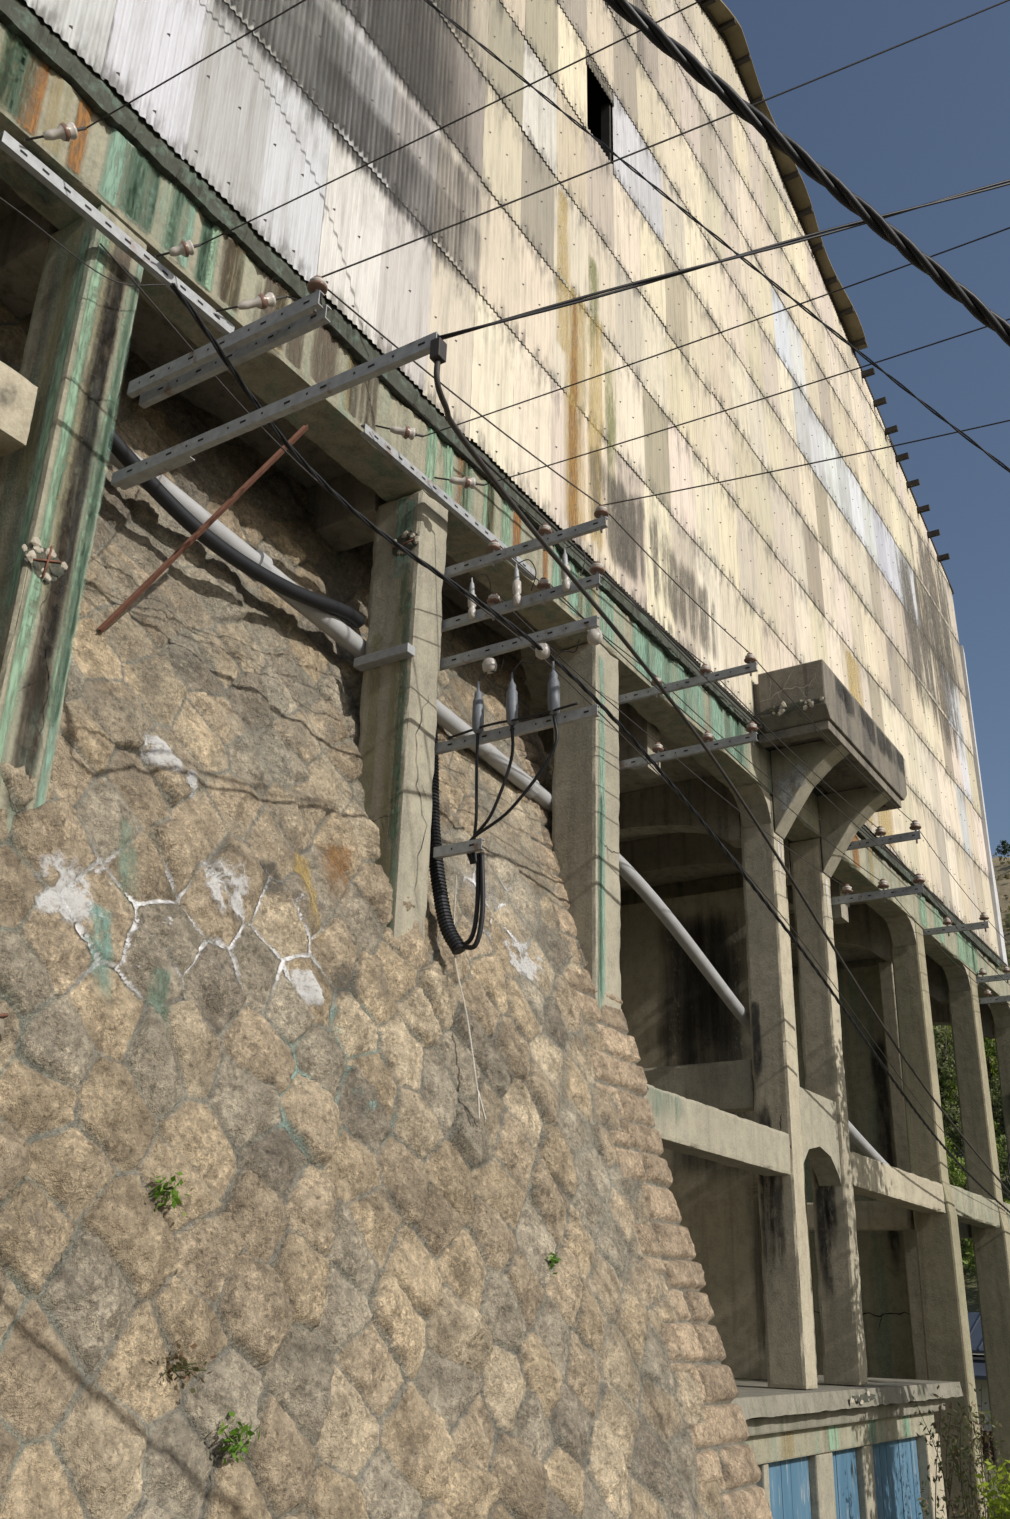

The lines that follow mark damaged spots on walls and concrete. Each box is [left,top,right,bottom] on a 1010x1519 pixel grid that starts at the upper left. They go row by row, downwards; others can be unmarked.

water stain [337,0,477,221]
water stain [100,128,241,311]
water stain [261,274,296,317]
water stain [279,326,378,430]
rust [569,304,577,527]
water stain [37,854,186,985]
water stain [190,854,358,1030]